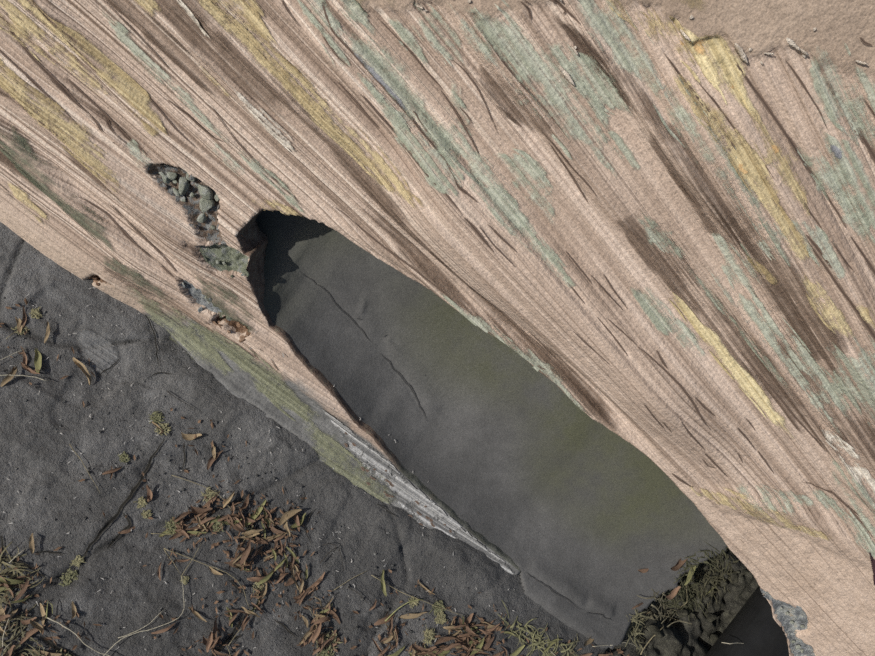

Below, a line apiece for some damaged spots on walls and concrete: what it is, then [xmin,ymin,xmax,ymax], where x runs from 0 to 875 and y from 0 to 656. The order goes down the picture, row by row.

crack [0,535,62,580]
crack [83,440,189,559]